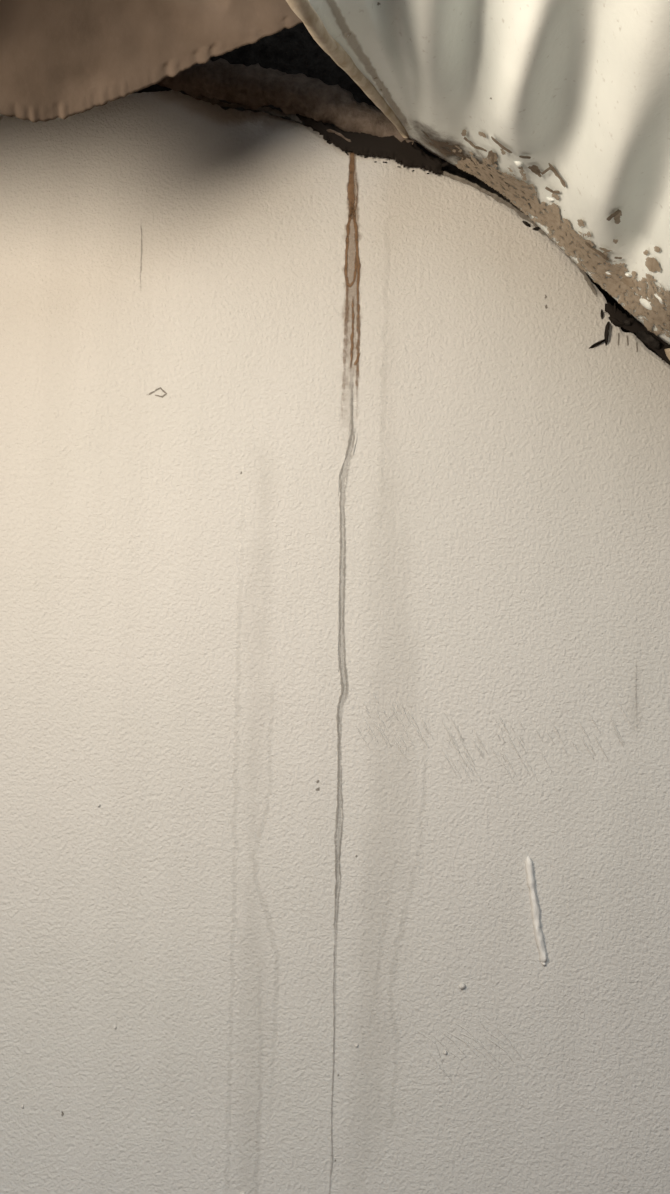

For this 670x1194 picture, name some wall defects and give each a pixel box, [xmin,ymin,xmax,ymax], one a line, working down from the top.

peeling [296,114,670,365]
crack [334,405,357,887]